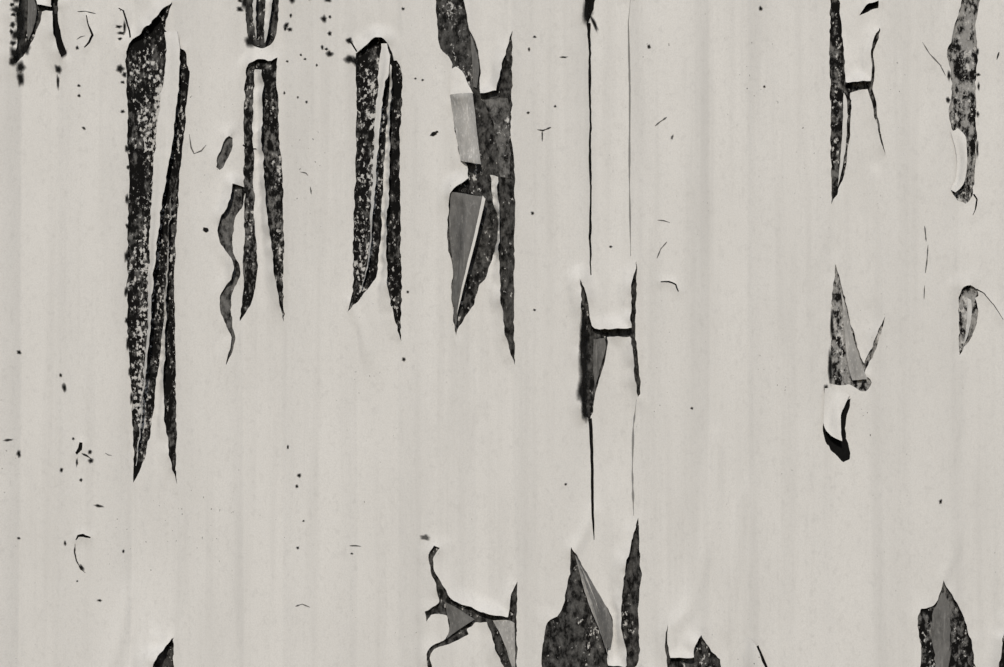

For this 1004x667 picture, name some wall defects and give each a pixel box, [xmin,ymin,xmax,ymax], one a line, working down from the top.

peeling [125,3,190,482]
peeling [203,0,285,364]
peeling [348,37,403,339]
peeling [436,0,515,364]
crack [585,21,593,275]
peeling [580,264,641,423]
peeling [829,0,885,204]
peeling [947,0,980,204]
crack [587,414,595,537]
peeling [425,546,518,667]
peeling [542,520,643,667]
peeling [918,581,976,667]